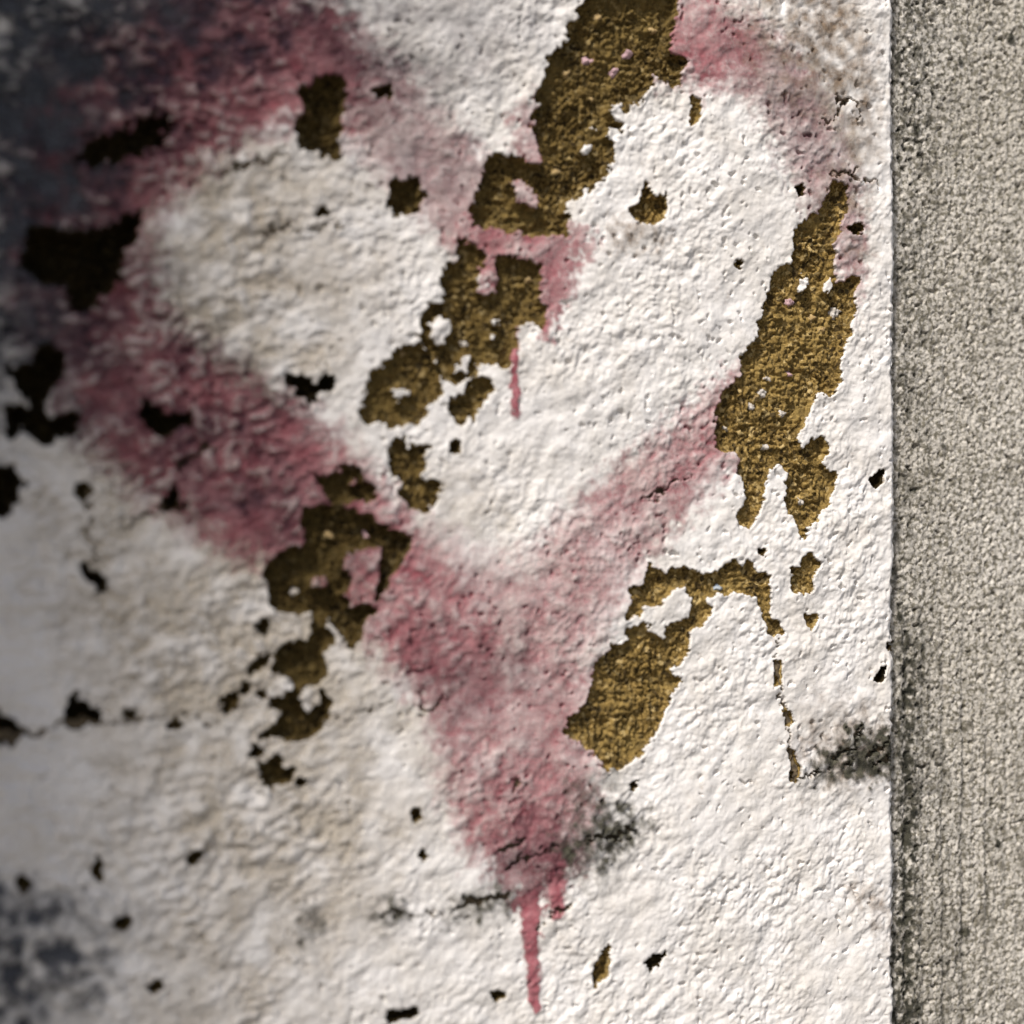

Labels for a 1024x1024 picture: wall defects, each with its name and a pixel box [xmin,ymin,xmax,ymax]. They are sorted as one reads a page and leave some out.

peeling [68,109,176,172]
peeling [293,74,349,162]
peeling [18,208,143,313]
peeling [358,0,688,514]
peeling [2,341,82,447]
peeling [713,180,864,540]
peeling [215,464,413,794]
peeling [562,548,785,772]
spalling [790,552,821,596]
spalling [804,613,819,631]
spalling [787,748,800,783]
crack [773,661,889,783]